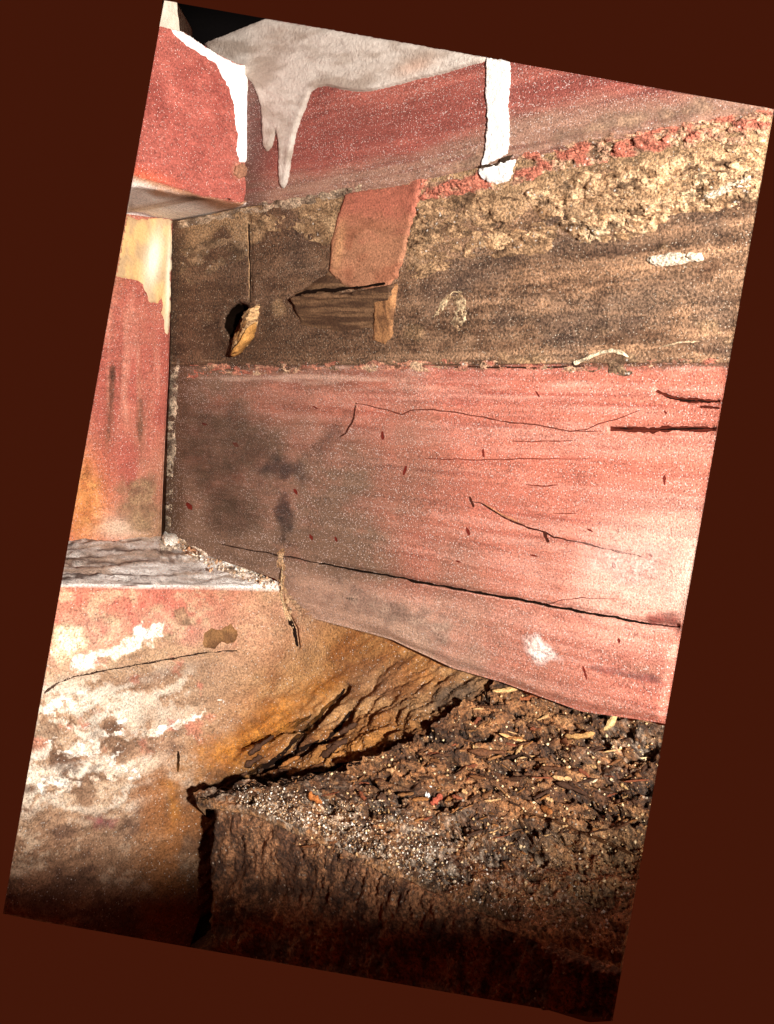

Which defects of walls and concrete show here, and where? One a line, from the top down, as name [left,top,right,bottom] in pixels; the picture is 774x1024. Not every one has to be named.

crack [340,386,640,461]
crack [469,497,646,558]
crack [222,544,680,646]
peeling [50,621,164,672]
crack [44,650,237,693]
rust [214,709,294,759]